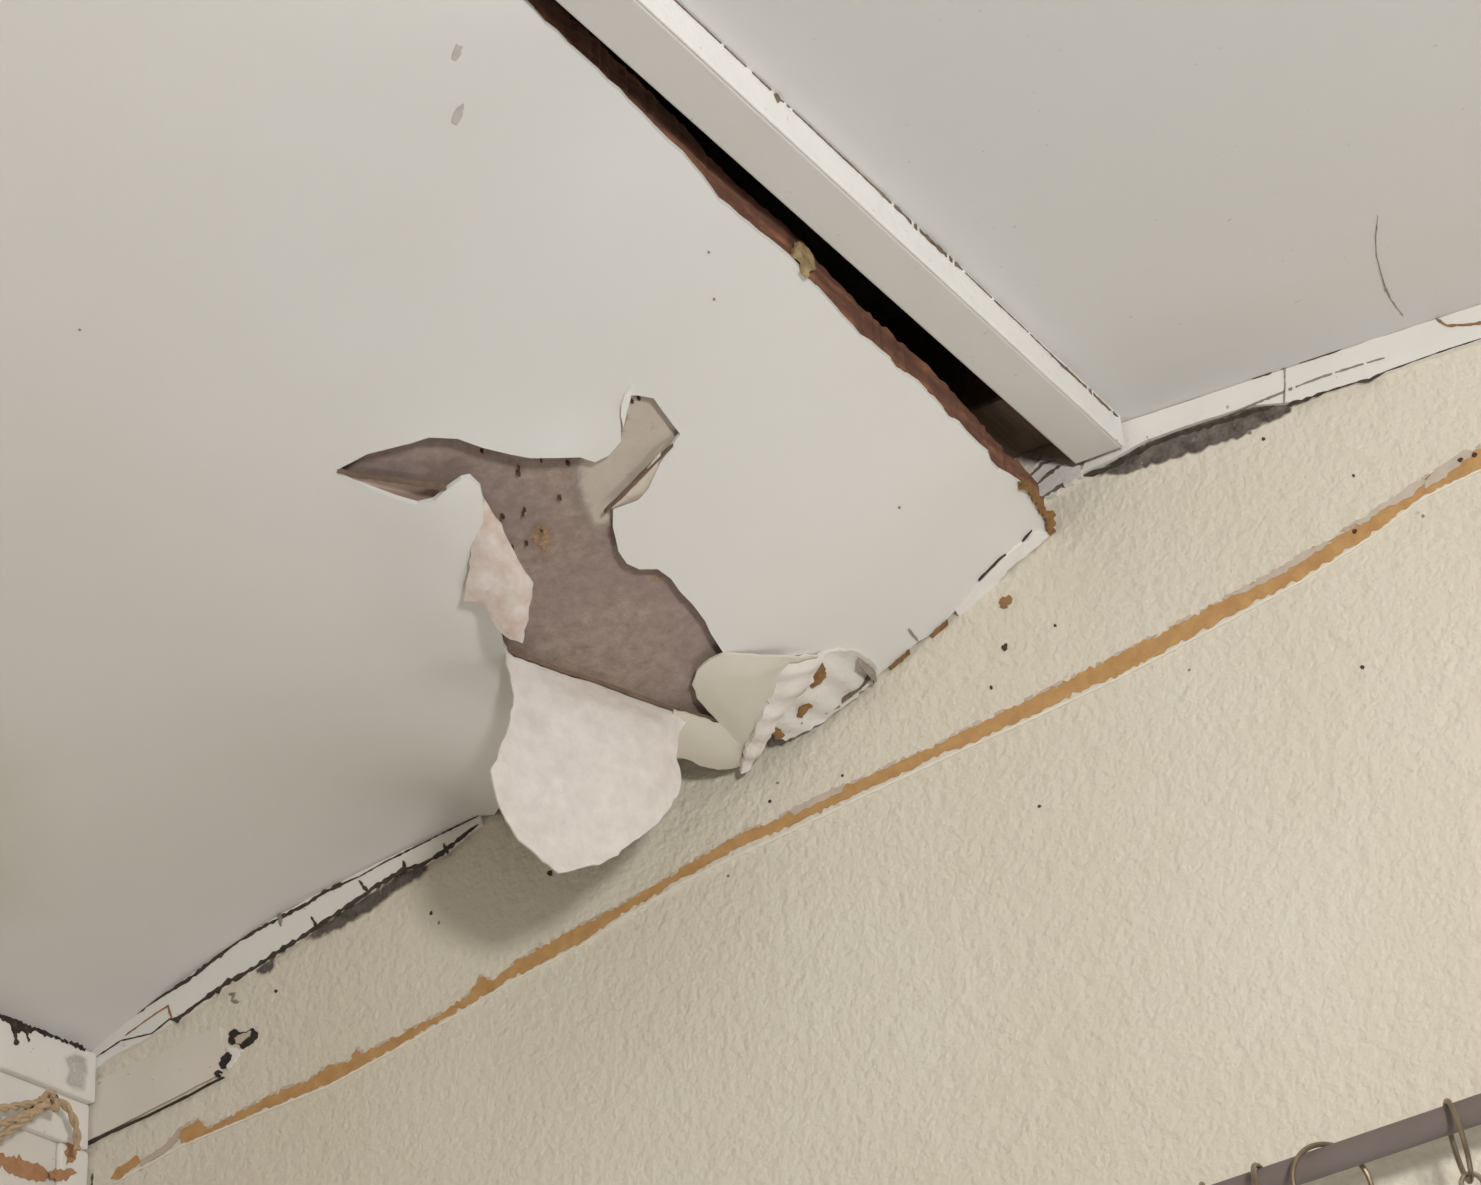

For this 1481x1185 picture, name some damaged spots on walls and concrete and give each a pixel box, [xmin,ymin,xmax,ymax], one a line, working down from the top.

crack [674,0,1119,417]
crack [1030,460,1065,498]
crack [96,816,478,1057]
peeling [110,386,1481,1184]